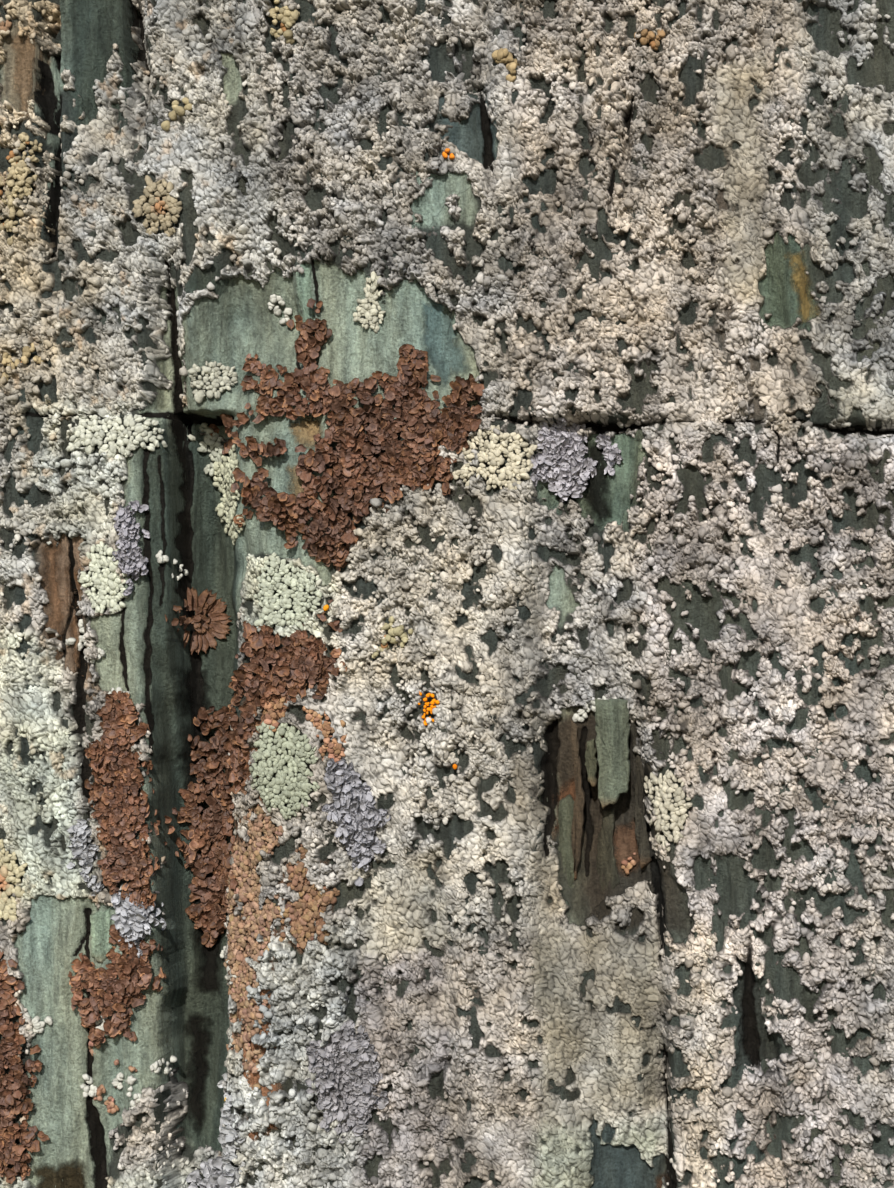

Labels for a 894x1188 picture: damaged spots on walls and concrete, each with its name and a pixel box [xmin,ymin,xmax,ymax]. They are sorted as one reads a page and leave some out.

crack [62,537,93,819]
crack [119,258,234,762]